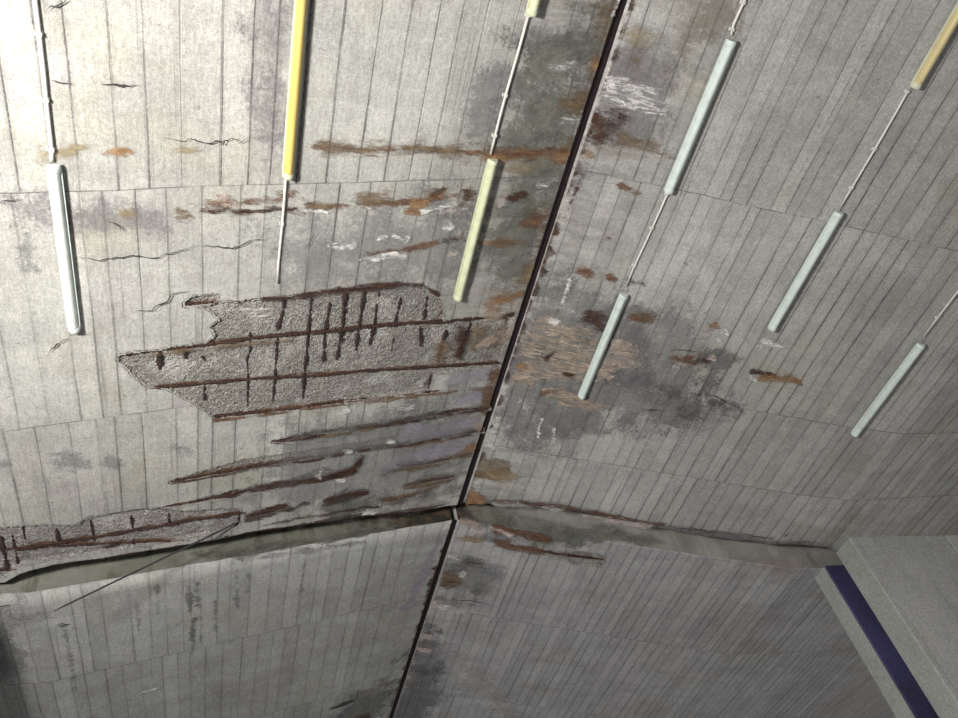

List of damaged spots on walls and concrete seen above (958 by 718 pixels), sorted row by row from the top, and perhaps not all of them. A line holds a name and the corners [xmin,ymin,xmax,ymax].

crack [78,239,264,261]
crack [169,137,258,145]
corrosion [177,188,476,219]
corrosion [311,0,671,204]
leakage [450,25,605,304]
spalling [115,282,517,423]
corrosion [223,209,665,527]
leakage [446,265,741,451]
spalling [0,405,492,579]
leakage [191,526,397,571]
leakage [295,401,494,520]
corrosion [450,518,551,555]